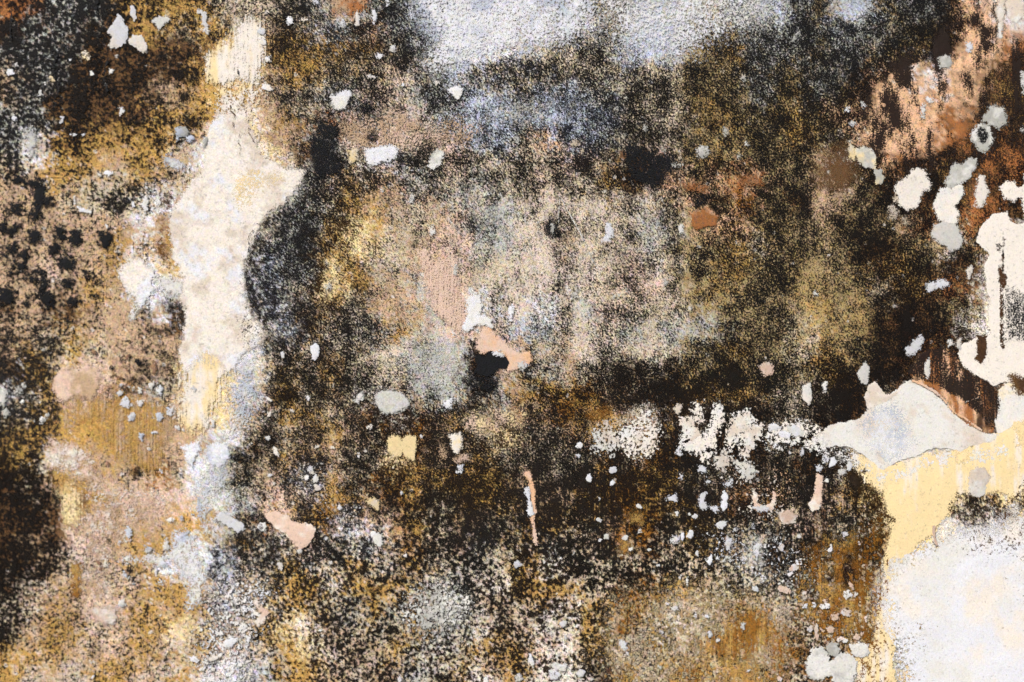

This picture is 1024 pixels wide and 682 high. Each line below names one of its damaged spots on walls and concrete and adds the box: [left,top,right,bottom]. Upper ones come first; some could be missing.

water stain [0,0,218,653]
peeling [414,248,533,377]
water stain [485,275,519,346]
peeling [666,0,1024,551]
water stain [948,480,1024,558]